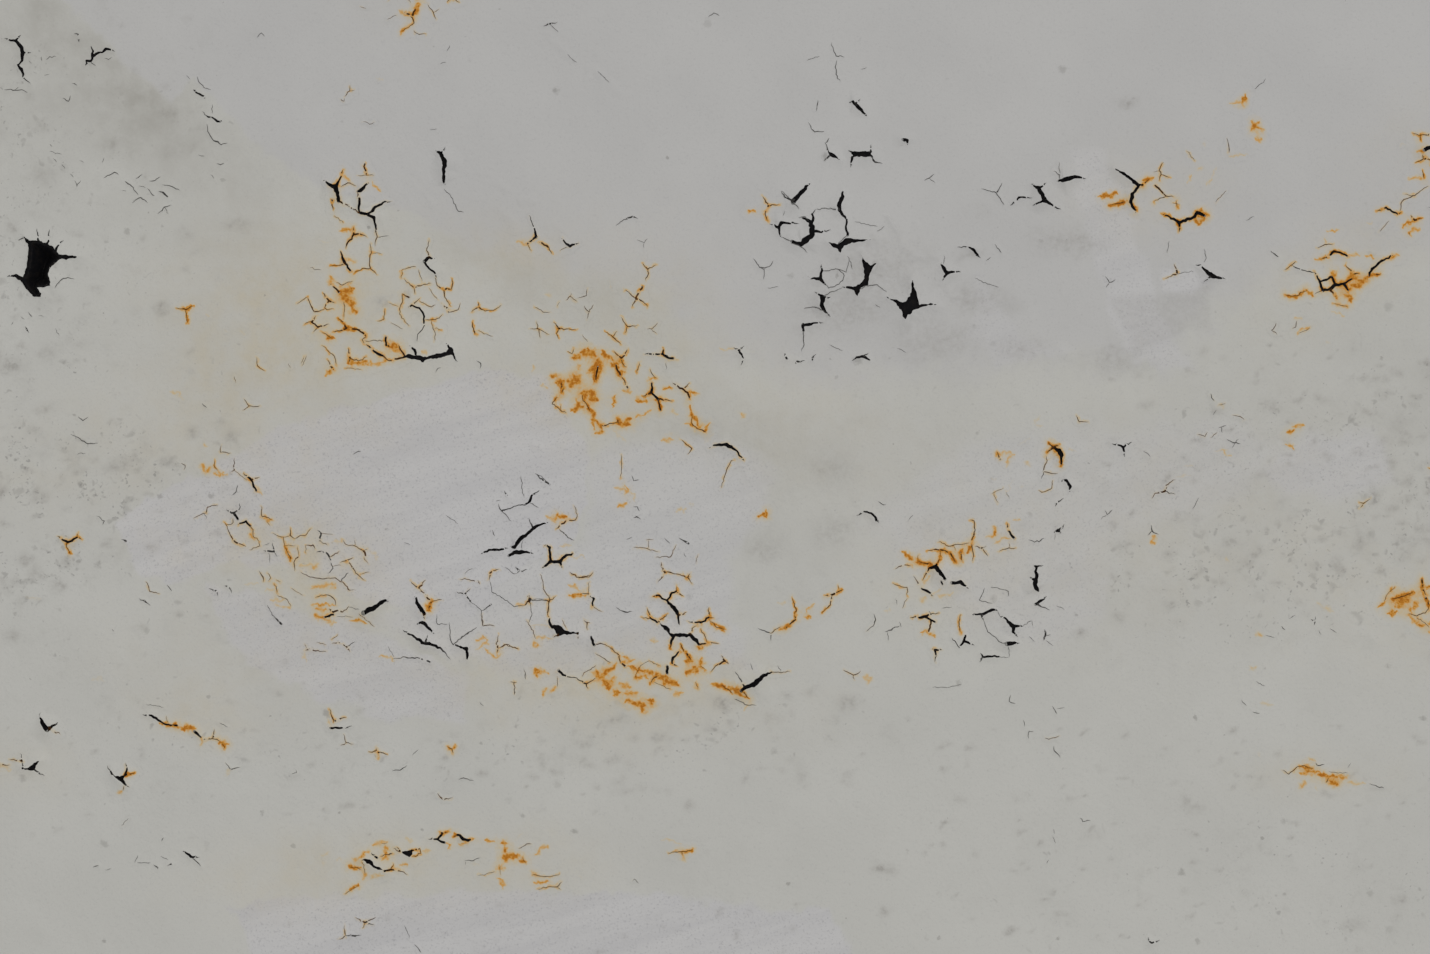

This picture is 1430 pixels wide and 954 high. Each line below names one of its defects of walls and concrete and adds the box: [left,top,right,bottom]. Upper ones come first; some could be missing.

peeling [4,217,97,315]
crack [931,158,1091,290]
crack [1143,125,1430,293]
corrosion [526,332,644,442]
crack [432,211,910,495]
corrosion [675,400,718,446]
crack [477,447,702,710]
crack [709,389,1250,761]
corrosion [1369,569,1430,641]
crack [321,702,421,775]
corrosion [1277,752,1389,799]
corrosion [476,830,555,874]